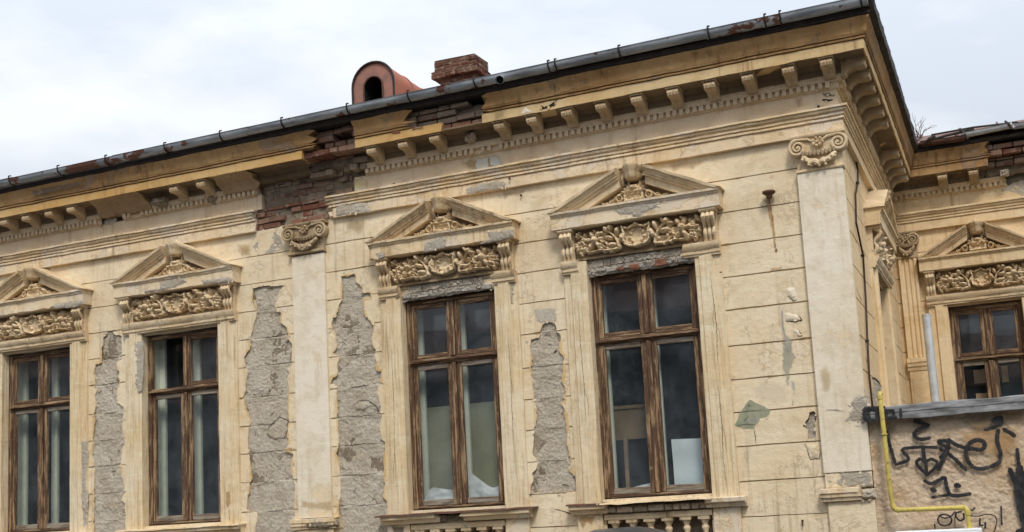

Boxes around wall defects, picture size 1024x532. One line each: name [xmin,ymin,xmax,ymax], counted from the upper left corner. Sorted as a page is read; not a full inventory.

flaking render [252,125,371,256]
rust [765,199,777,252]
flaking render [81,327,144,532]
flaking render [243,270,388,532]
flaking render [525,312,576,497]
damp [781,313,795,389]
flaking render [803,411,817,439]
flaking render [845,377,882,427]